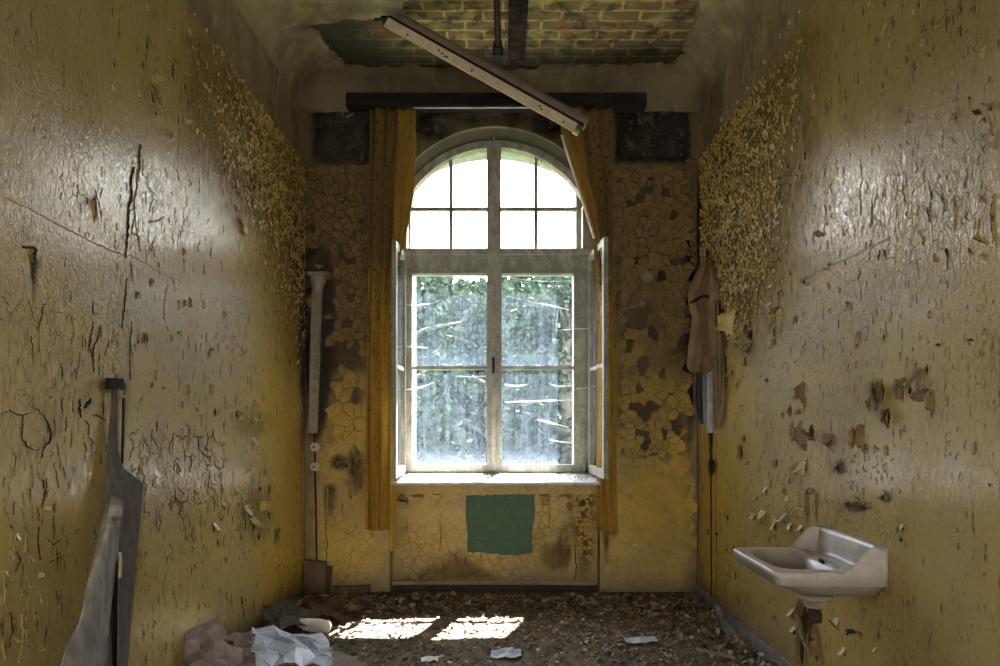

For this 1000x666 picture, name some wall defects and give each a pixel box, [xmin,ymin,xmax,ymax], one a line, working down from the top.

flaking render [310,19,456,69]
flaking render [402,0,699,70]
peeling [138,28,369,452]
peeling [614,6,820,469]
crack [0,144,296,663]
peeling [749,381,834,540]
peeling [847,423,868,454]
peeling [864,352,934,429]
peeling [767,597,863,666]